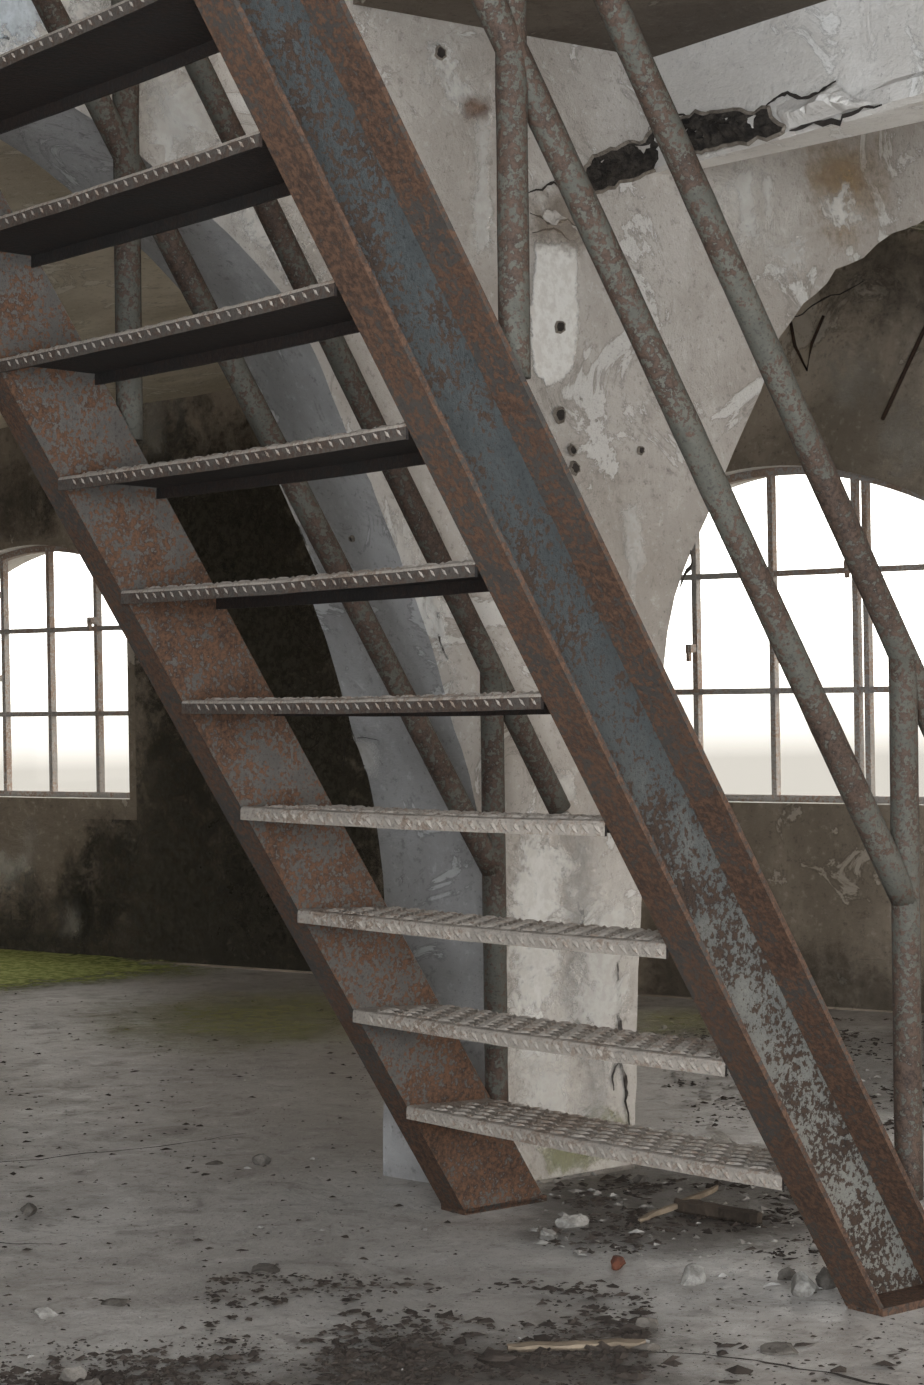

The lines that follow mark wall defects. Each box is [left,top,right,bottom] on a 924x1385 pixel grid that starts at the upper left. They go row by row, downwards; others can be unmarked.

spalling [583,129,658,195]
spalling [680,105,786,155]
damp [136,405,253,465]
damp [167,485,318,584]
damp [227,604,342,698]
damp [285,716,374,807]
damp [0,685,311,971]
damp [344,826,385,902]
crack [616,961,624,1030]
crack [611,1063,630,1125]